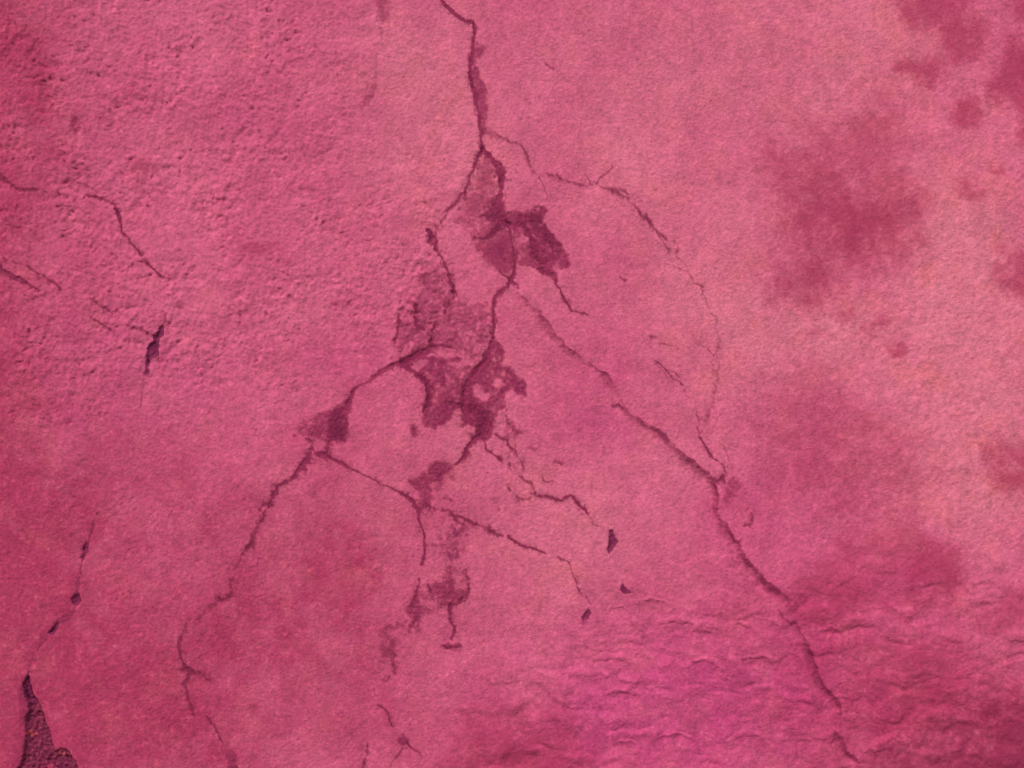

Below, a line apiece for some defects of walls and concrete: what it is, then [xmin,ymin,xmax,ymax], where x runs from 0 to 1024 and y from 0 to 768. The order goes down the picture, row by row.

crack [0,258,62,290]
crack [86,194,170,279]
spalling [506,206,570,281]
spalling [293,402,351,452]
crack [344,338,434,405]
spalling [393,273,536,506]
crack [426,0,855,757]
crack [242,447,591,607]
crack [28,512,97,677]
spalling [12,675,78,768]
crack [177,635,238,768]
crack [377,704,420,753]